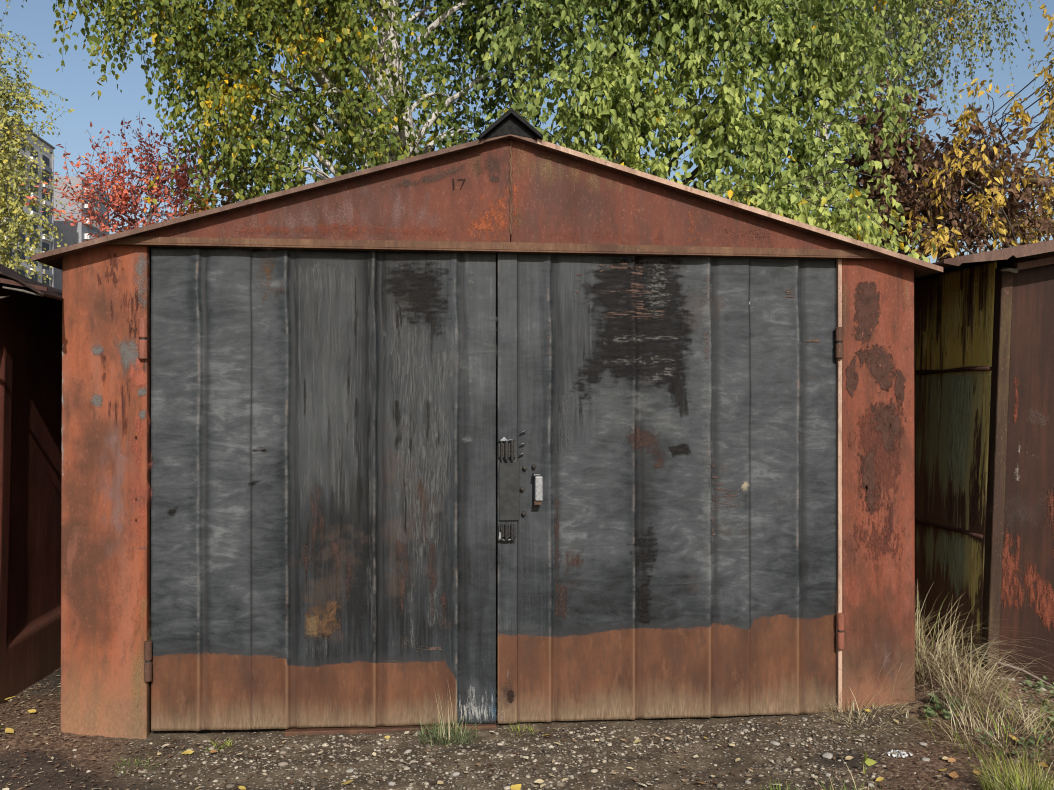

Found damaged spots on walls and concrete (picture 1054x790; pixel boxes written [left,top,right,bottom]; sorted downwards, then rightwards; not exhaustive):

peeling [577,258,692,407]
corrosion [108,386,130,435]
corrosion [306,601,341,637]
peeling [1001,529,1054,629]